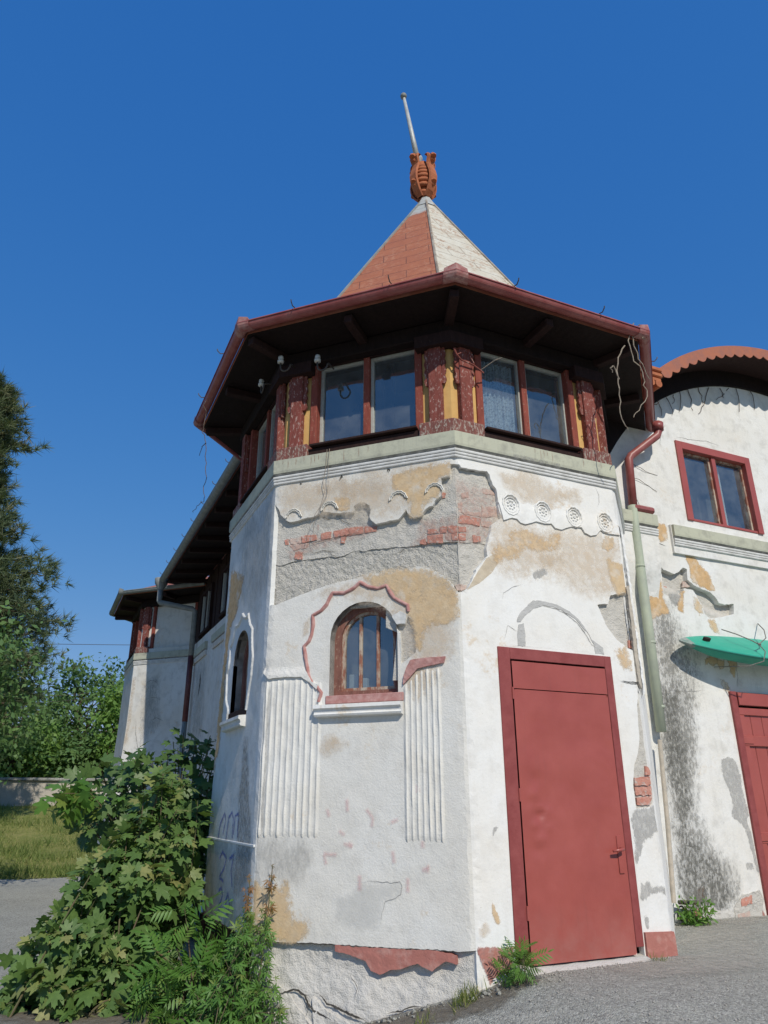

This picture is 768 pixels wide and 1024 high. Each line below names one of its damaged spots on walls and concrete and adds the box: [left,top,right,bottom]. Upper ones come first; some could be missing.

flaking render [274,463,652,808]
flaking render [650,555,729,633]
damp [653,613,740,911]
damp [631,806,658,863]
flaking render [249,881,514,1024]